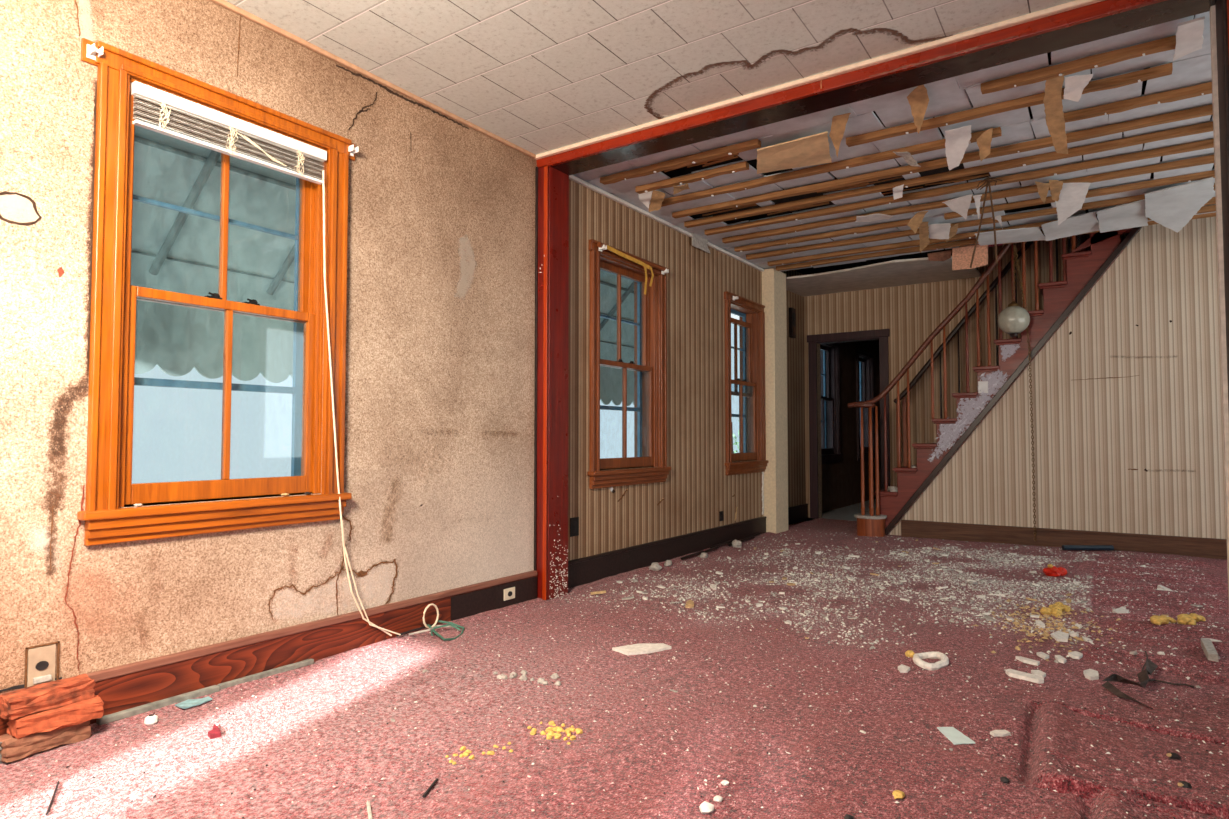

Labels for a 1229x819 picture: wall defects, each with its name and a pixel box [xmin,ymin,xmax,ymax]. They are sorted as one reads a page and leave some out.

crack [336,65,469,152]
leakage [644,28,953,119]
peeling [869,36,1018,77]
peeling [0,191,42,225]
leakage [41,78,97,576]
crack [50,485,85,671]
crack [268,515,398,623]